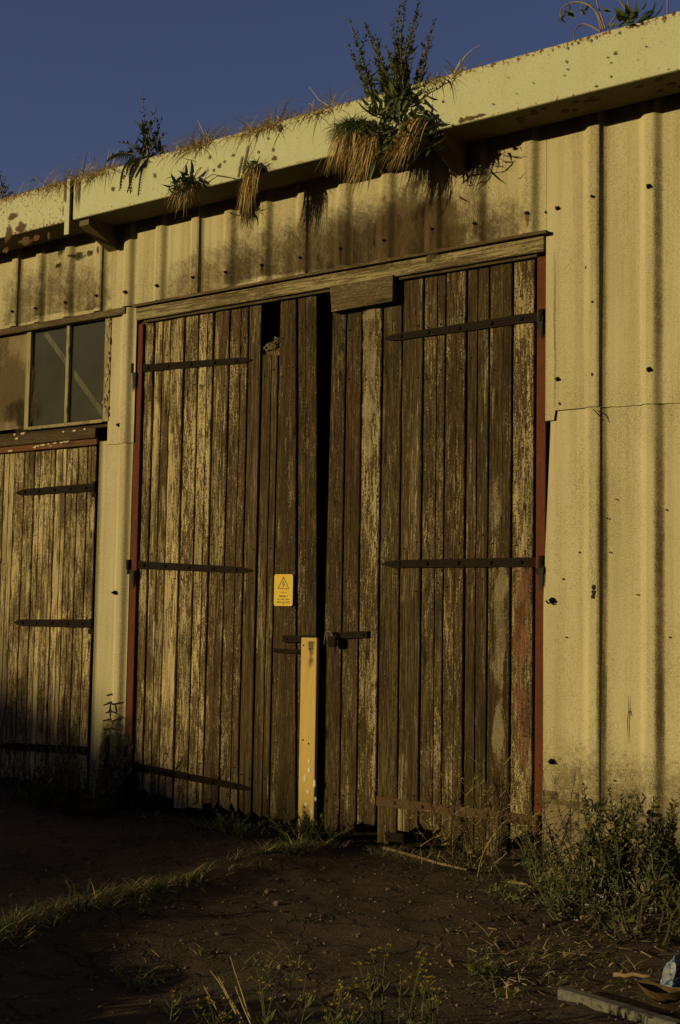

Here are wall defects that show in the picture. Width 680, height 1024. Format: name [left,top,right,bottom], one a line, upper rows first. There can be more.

rust [3,213,50,253]